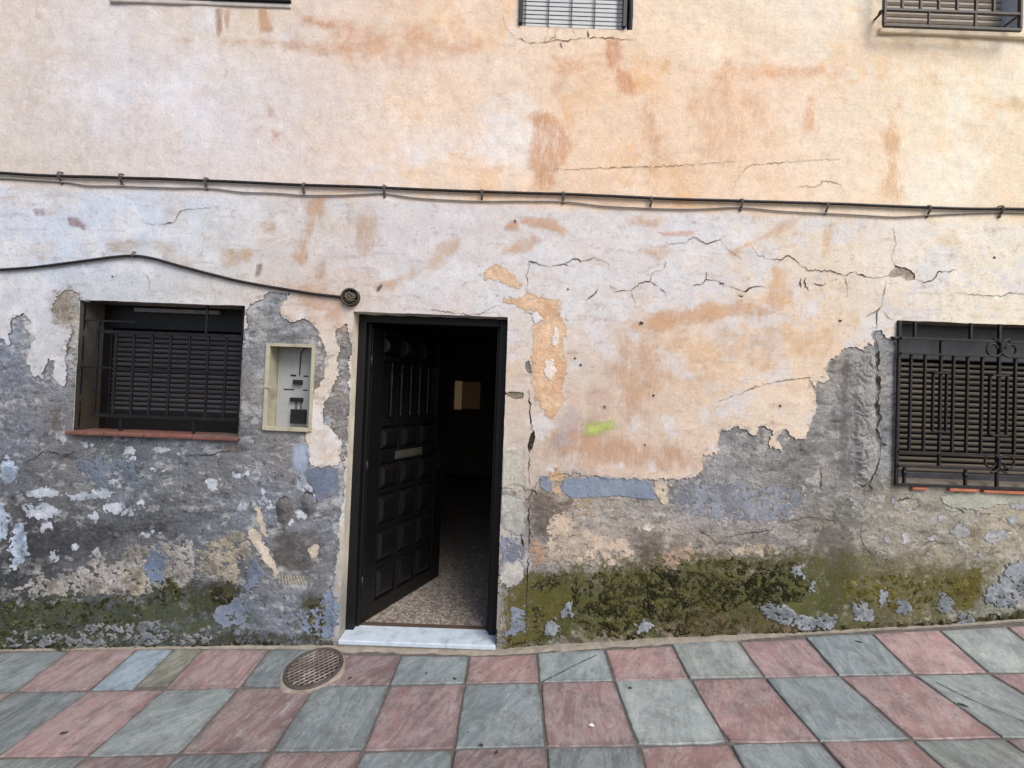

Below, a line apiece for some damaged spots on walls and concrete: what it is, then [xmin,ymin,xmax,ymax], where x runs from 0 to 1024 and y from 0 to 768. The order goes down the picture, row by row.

crack [503,17,636,47]
peeling [478,264,568,420]
crack [526,231,924,504]
damp [2,620,212,649]
peeling [0,289,352,651]
crack [521,456,538,635]
peeling [496,330,1024,649]